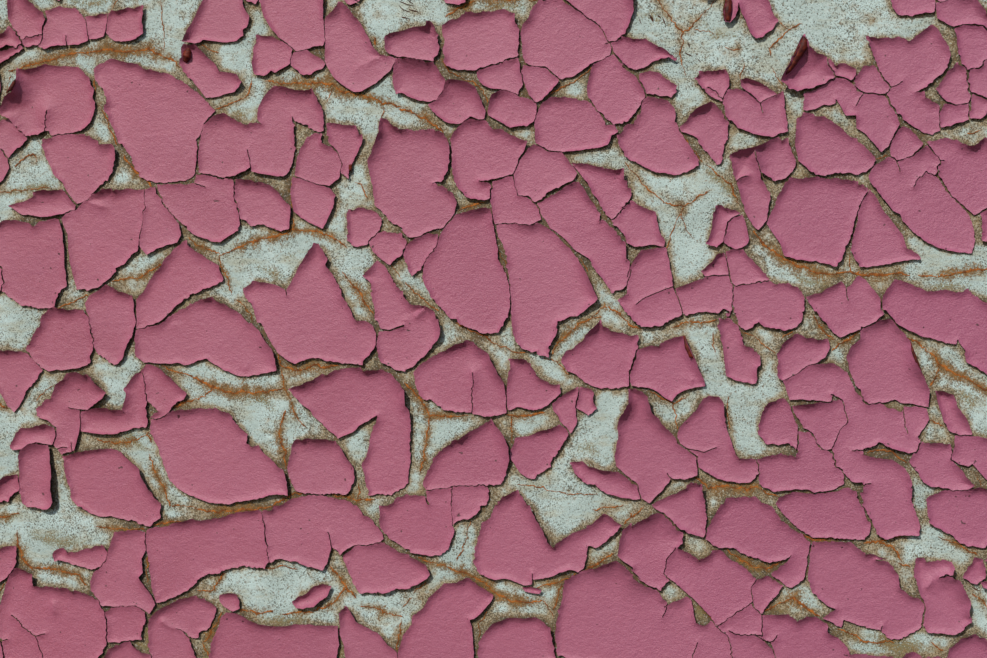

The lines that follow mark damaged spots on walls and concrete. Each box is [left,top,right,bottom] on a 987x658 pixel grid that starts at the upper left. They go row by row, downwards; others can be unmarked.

crack [215,80,444,133]
crack [753,231,987,277]
rust [198,376,270,401]
crack [162,354,338,469]
peeling [0,0,597,658]
rust [275,361,330,459]
crack [391,265,642,375]
peeling [209,0,987,658]
rust [915,340,987,396]
rust [18,546,85,582]
crack [197,521,614,657]
rust [422,556,539,609]